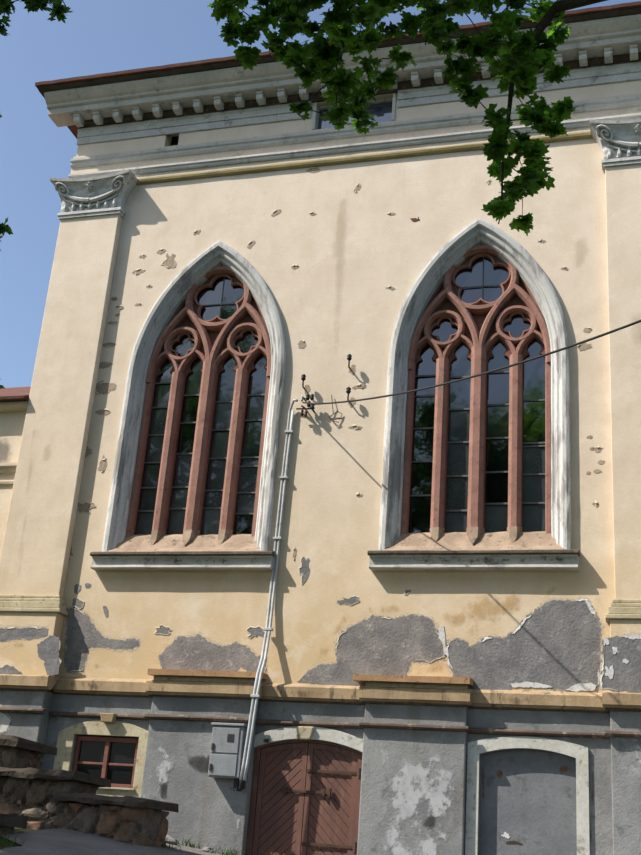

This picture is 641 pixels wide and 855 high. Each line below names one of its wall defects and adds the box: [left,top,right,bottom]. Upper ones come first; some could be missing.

peeling [157,248,176,269]
spalling [300,598,641,693]
peeling [0,704,12,734]